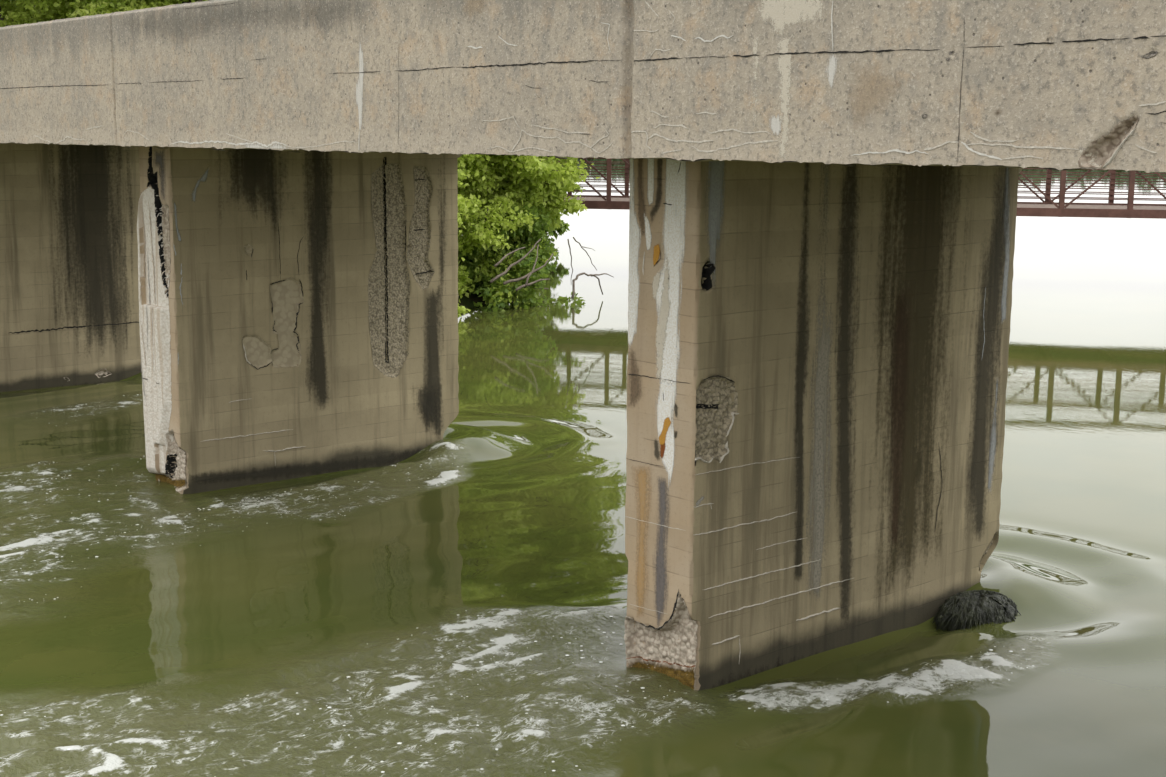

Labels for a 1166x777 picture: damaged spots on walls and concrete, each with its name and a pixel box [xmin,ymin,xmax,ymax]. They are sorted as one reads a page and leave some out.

damp [52,144,133,345]
crack [34,126,356,298]
damp [213,149,332,404]
spalling [368,157,435,378]
crack [329,0,1166,160]
spalling [1078,115,1139,168]
rust [654,404,677,459]
spalling [695,375,798,475]
damp [795,163,857,618]
damp [875,165,961,582]
rust [636,470,649,613]
spalling [624,578,853,690]